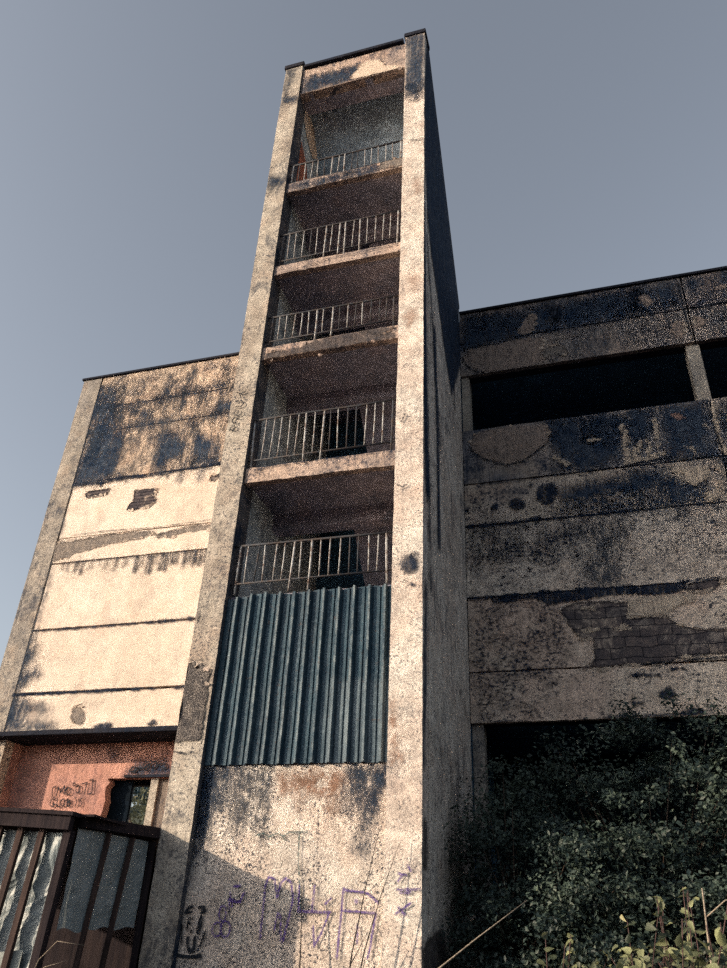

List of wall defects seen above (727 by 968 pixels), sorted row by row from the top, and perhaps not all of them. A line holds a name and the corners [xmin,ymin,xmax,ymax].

leakage [405,34,677,547]
spalling [83,487,111,499]
peeling [52,524,211,561]
spalling [126,487,158,512]
leakage [68,368,235,500]
leakage [466,402,727,722]
peeling [618,417,666,465]
peeling [669,445,725,502]
leakage [7,549,207,731]
leakage [401,551,432,766]
spalling [559,577,727,673]
leakage [190,767,270,866]